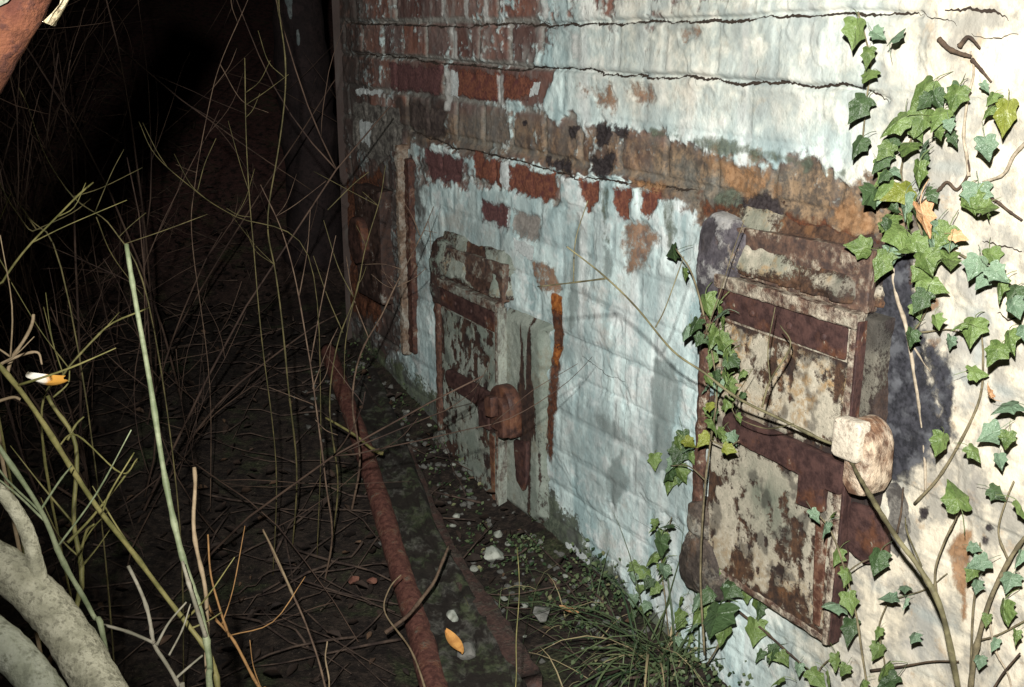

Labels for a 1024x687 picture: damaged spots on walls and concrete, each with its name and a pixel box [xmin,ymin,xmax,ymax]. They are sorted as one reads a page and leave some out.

crack [347,6,1016,39]
spalling [353,62,541,165]
peeling [584,85,617,110]
crack [355,52,889,102]
peeling [632,83,653,102]
peeling [425,148,562,292]
crack [414,130,697,192]
peeling [577,177,600,213]
peeling [613,186,662,273]
rust [698,146,778,217]
rust [785,200,879,244]
rust [546,293,564,461]